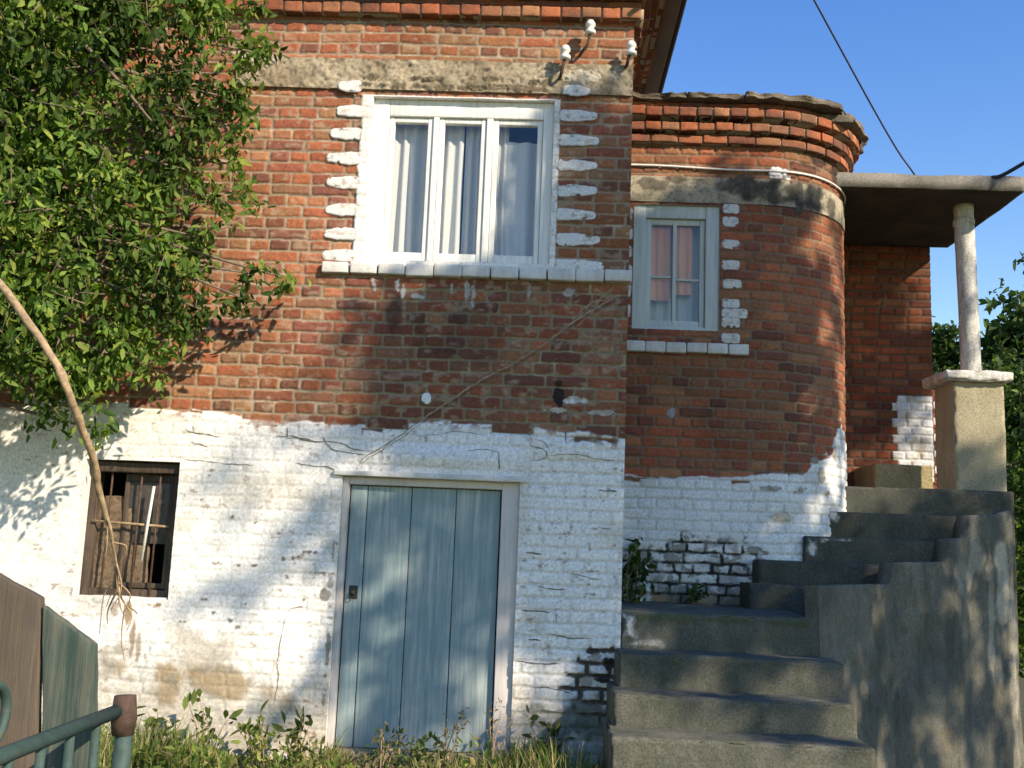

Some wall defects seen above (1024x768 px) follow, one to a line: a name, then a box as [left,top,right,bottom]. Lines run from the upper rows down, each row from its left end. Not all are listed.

damp [722,174,835,218]
crack [273,283,620,470]
crack [183,428,248,465]
peeling [622,534,767,606]
spalling [558,646,615,718]